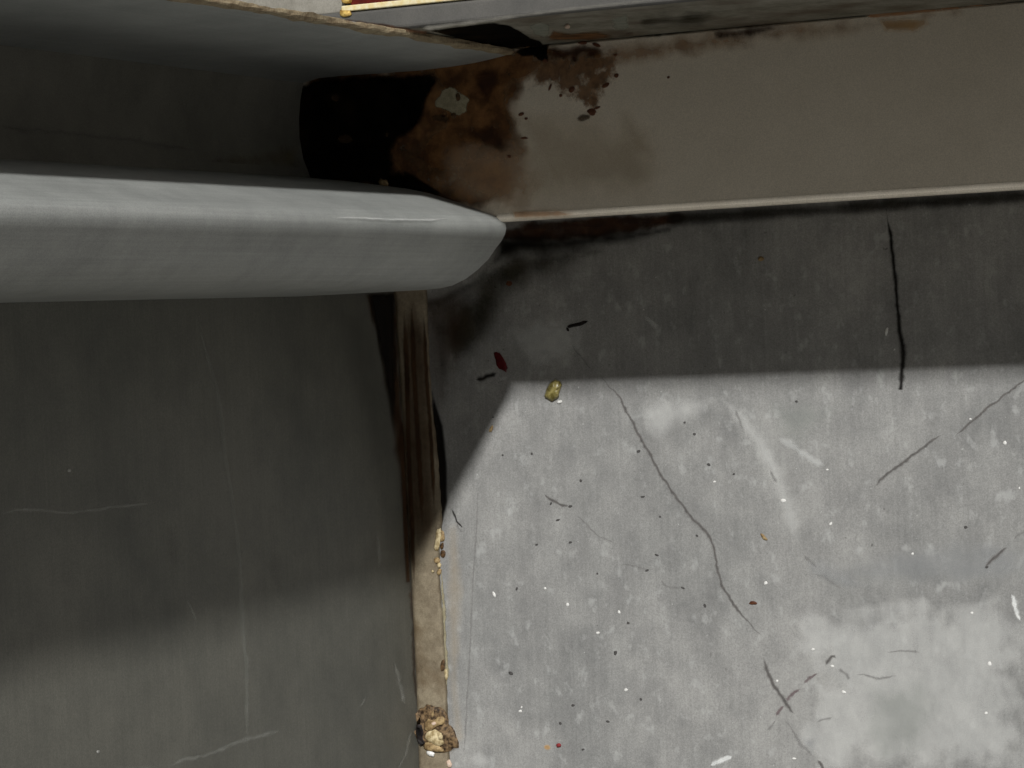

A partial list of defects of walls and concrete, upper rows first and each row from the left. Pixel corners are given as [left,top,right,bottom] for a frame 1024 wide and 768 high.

spalling [433,87,469,122]
rust [308,28,779,207]
crack [888,223,905,390]
crack [609,387,753,627]
crack [877,381,1023,484]
crack [764,655,888,768]